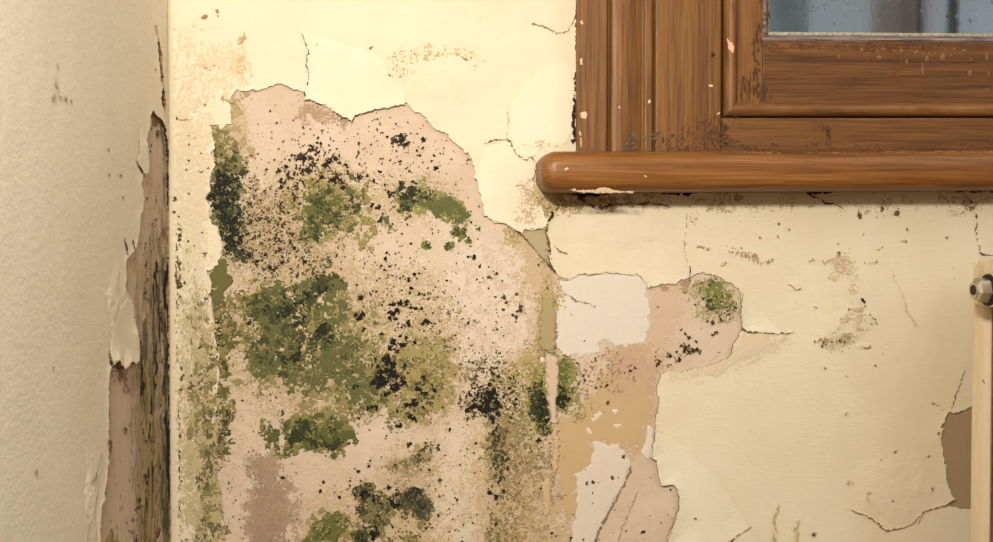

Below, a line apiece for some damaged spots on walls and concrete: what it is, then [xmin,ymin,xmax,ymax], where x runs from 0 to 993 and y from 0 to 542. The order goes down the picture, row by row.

crack [532,10,576,144]
crack [137,92,189,206]
leakage [834,192,920,219]
leakage [933,191,993,217]
spalling [100,116,167,542]
leakage [105,13,822,542]
spalling [206,30,781,542]
mould [814,298,878,352]
crack [893,273,917,326]
spalling [941,407,972,509]